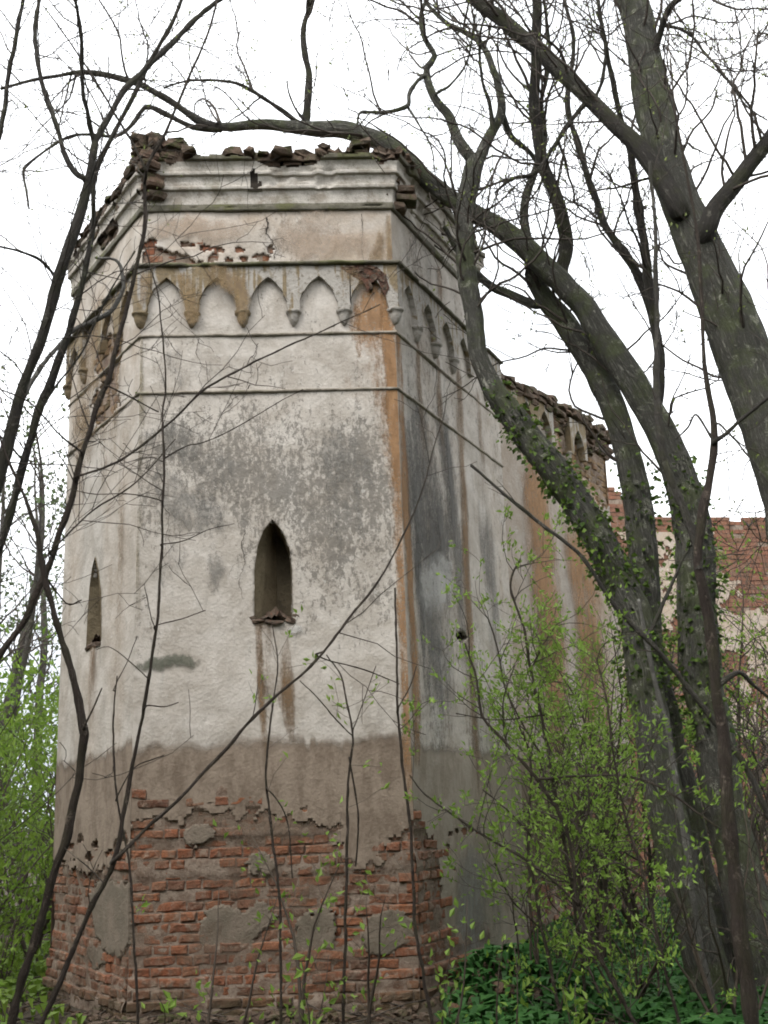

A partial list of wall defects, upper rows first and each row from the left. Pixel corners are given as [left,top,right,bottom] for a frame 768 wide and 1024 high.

spalling [143,240,275,264]
spalling [341,216,392,296]
rust [257,623,270,737]
rust [281,662,295,731]
rust [352,283,421,784]
damp [406,403,464,709]
rust [457,371,480,778]
spalling [42,786,490,1018]
damp [53,734,530,952]